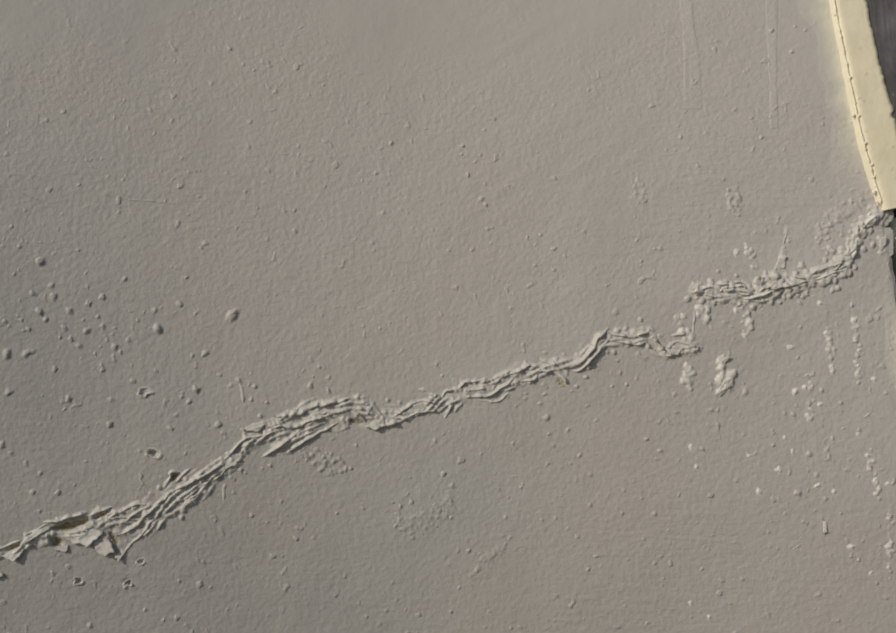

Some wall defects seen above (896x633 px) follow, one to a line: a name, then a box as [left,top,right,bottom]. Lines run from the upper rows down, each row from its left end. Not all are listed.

crack [0,204,894,577]